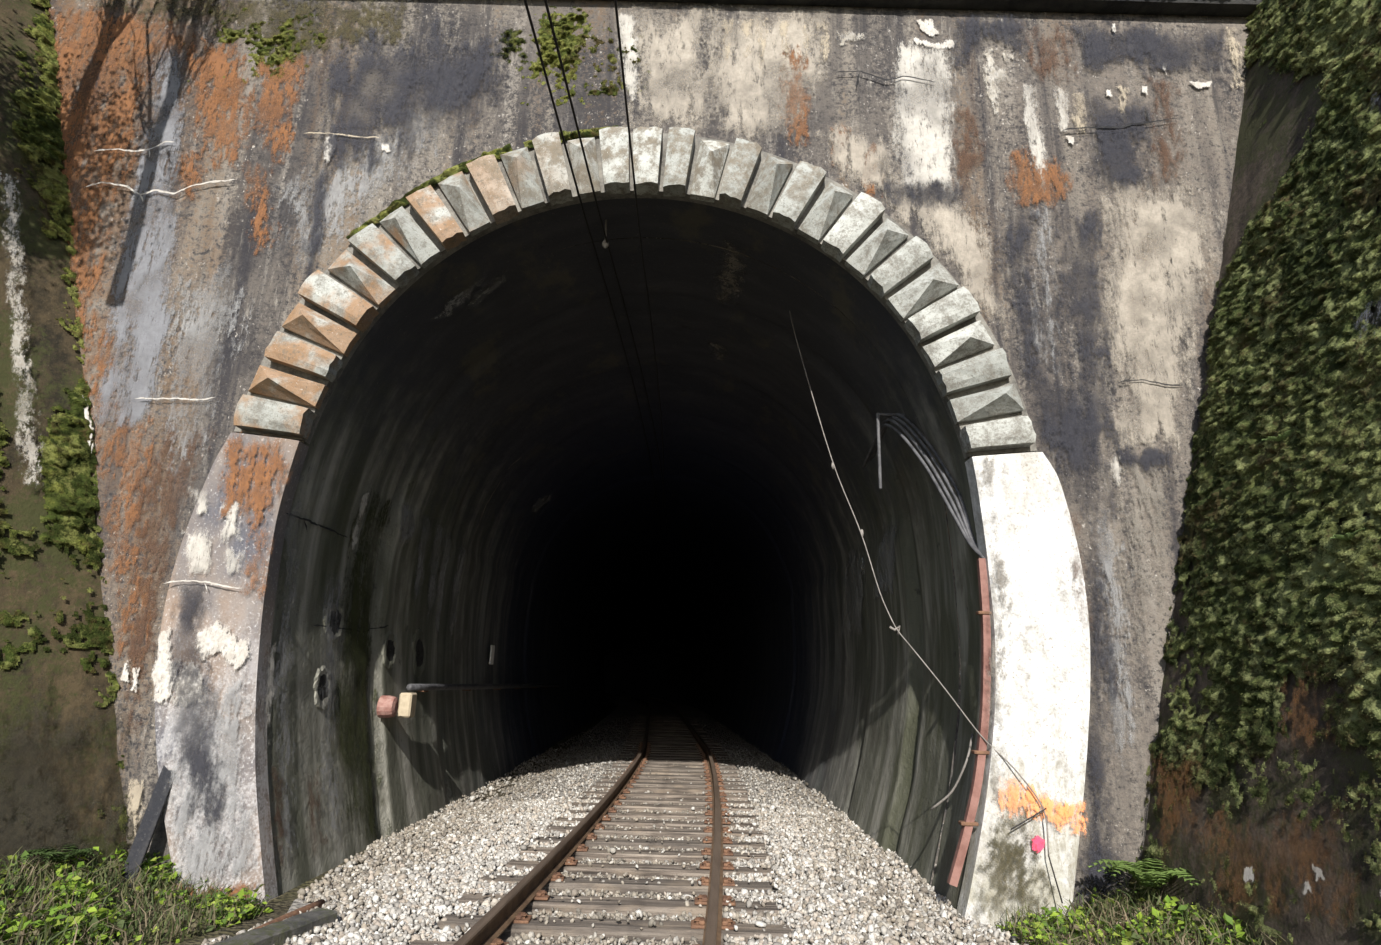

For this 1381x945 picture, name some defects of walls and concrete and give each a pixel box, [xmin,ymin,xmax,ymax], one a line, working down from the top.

corrosion [783,45,808,70]
crack [86,141,234,201]
corrosion [1009,149,1073,206]
corrosion [48,3,311,723]
water stain [817,14,1244,746]
water stain [352,492,371,549]
corrosion [1281,664,1330,748]
water stain [1088,715,1109,816]
water stain [1078,832,1125,895]
water stain [1243,866,1254,883]
corrosion [1151,747,1357,926]
water stain [1302,864,1325,894]